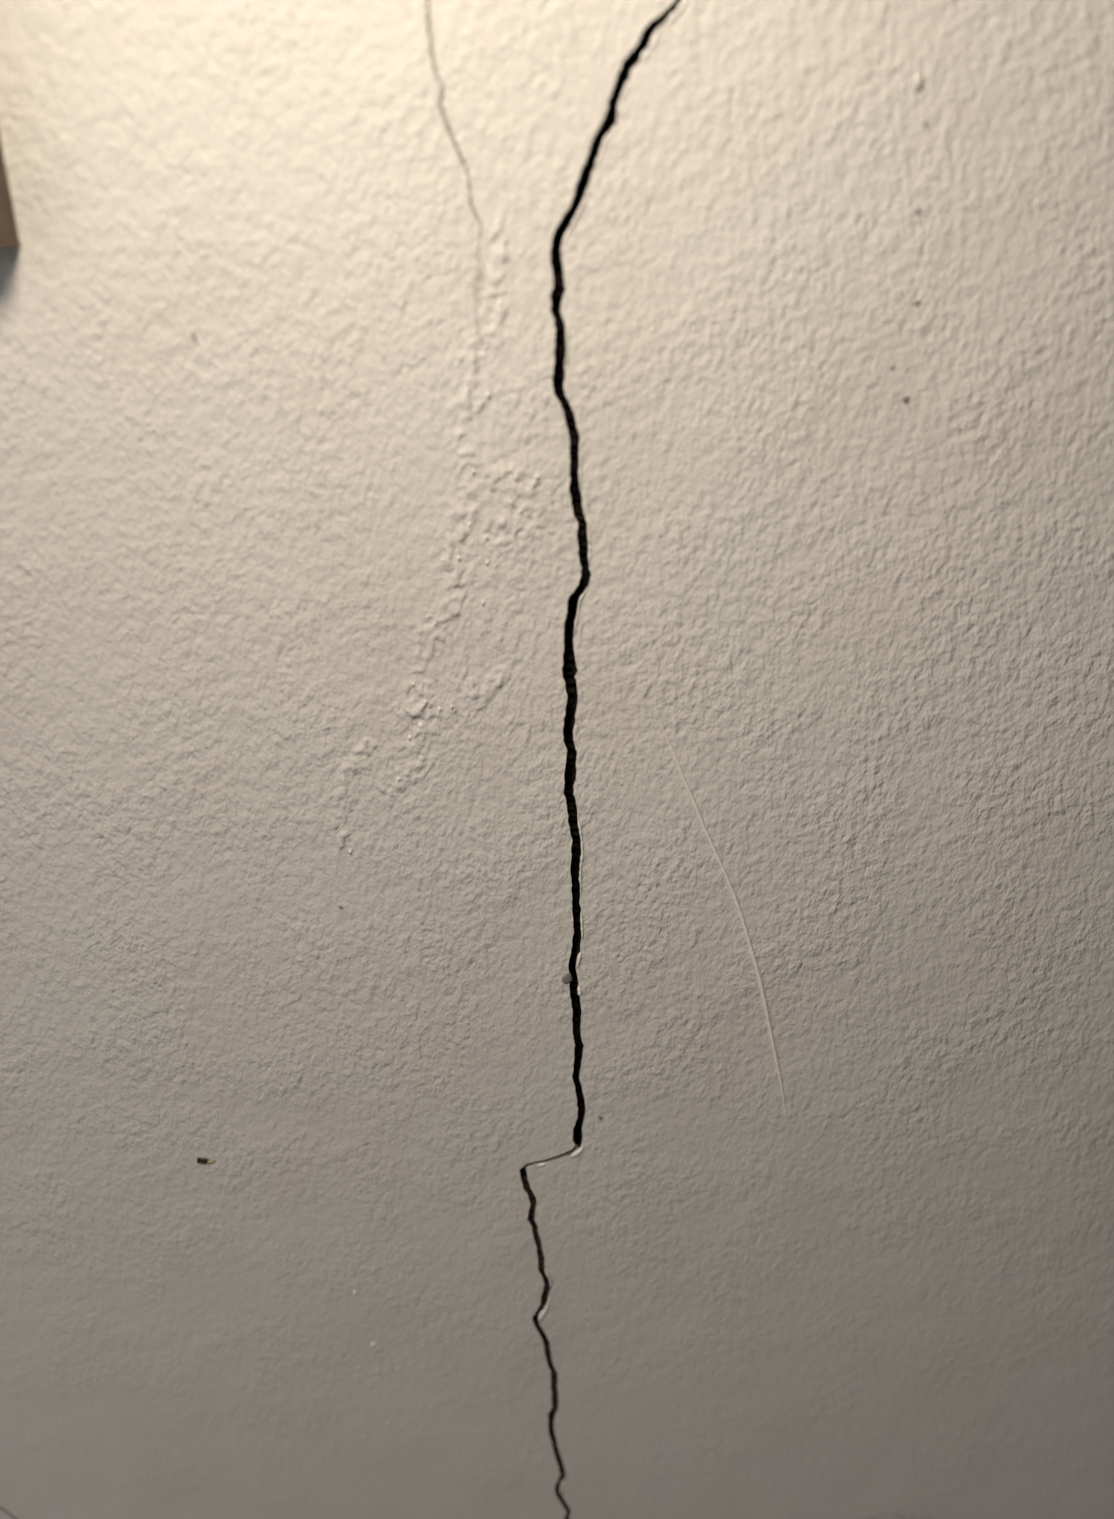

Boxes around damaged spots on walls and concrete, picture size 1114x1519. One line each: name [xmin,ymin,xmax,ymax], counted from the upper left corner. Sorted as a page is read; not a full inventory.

crack [520,0,688,1519]